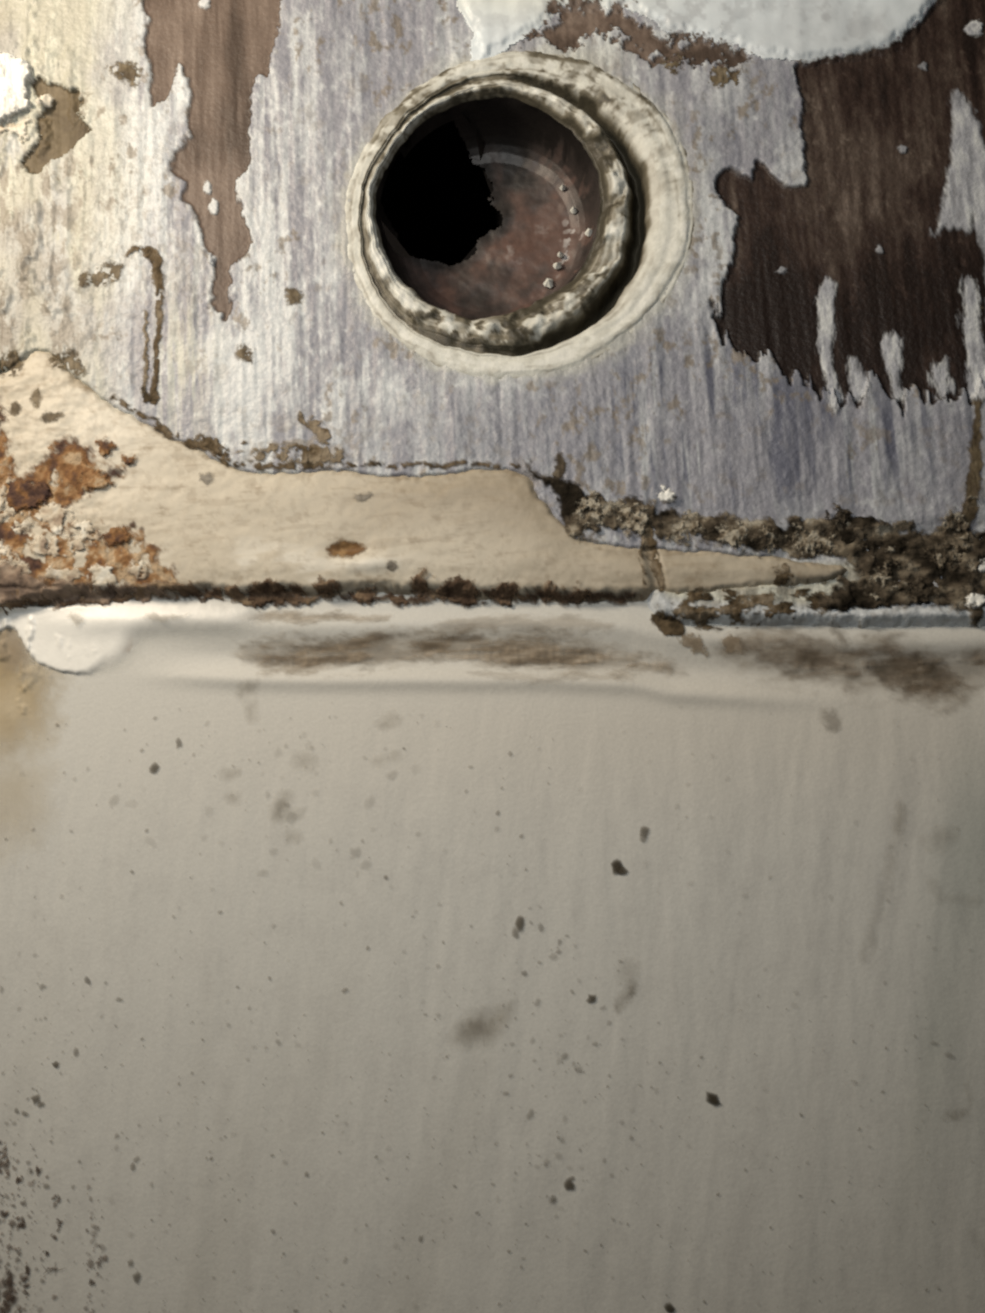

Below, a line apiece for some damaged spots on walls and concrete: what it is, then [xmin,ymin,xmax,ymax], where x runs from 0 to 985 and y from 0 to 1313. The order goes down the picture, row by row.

peeling [21,76,92,174]
peeling [109,0,281,321]
peeling [711,0,985,416]
peeling [285,288,303,304]
peeling [49,349,85,375]
peeling [235,345,252,362]
spalling [10,388,62,422]
rust [0,407,643,616]
spalling [326,541,365,557]
leakage [256,632,611,668]
leakage [681,633,962,696]
rust [3,1219,62,1313]